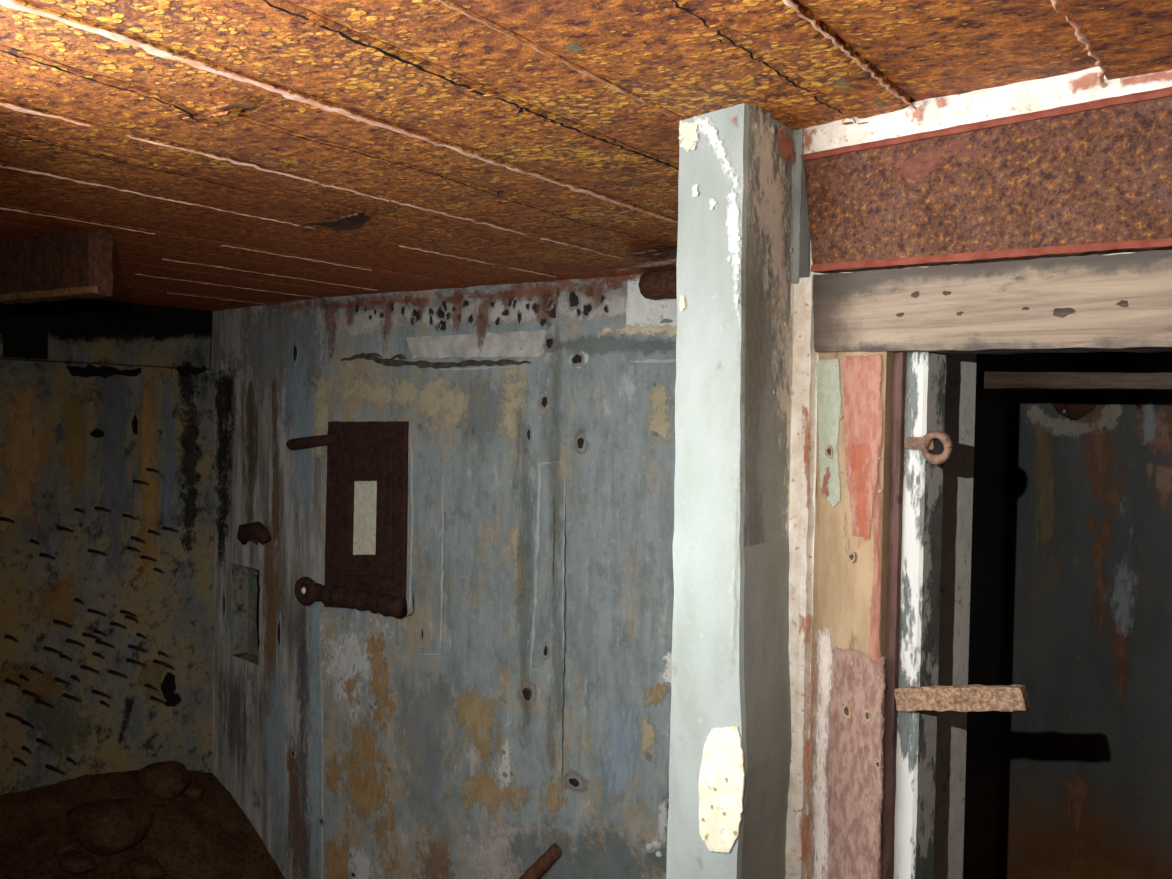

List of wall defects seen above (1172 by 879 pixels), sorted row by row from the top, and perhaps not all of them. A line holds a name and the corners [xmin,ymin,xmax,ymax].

crack [0,50,633,236]
crack [263,0,679,170]
crack [645,0,869,125]
rust [911,98,945,122]
rust [267,274,643,356]
peeling [679,105,794,538]
rust [1046,390,1101,421]
water stain [0,362,236,578]
peeling [808,354,885,879]
peeling [640,651,672,762]
rust [895,684,1030,712]
peeling [644,795,669,857]